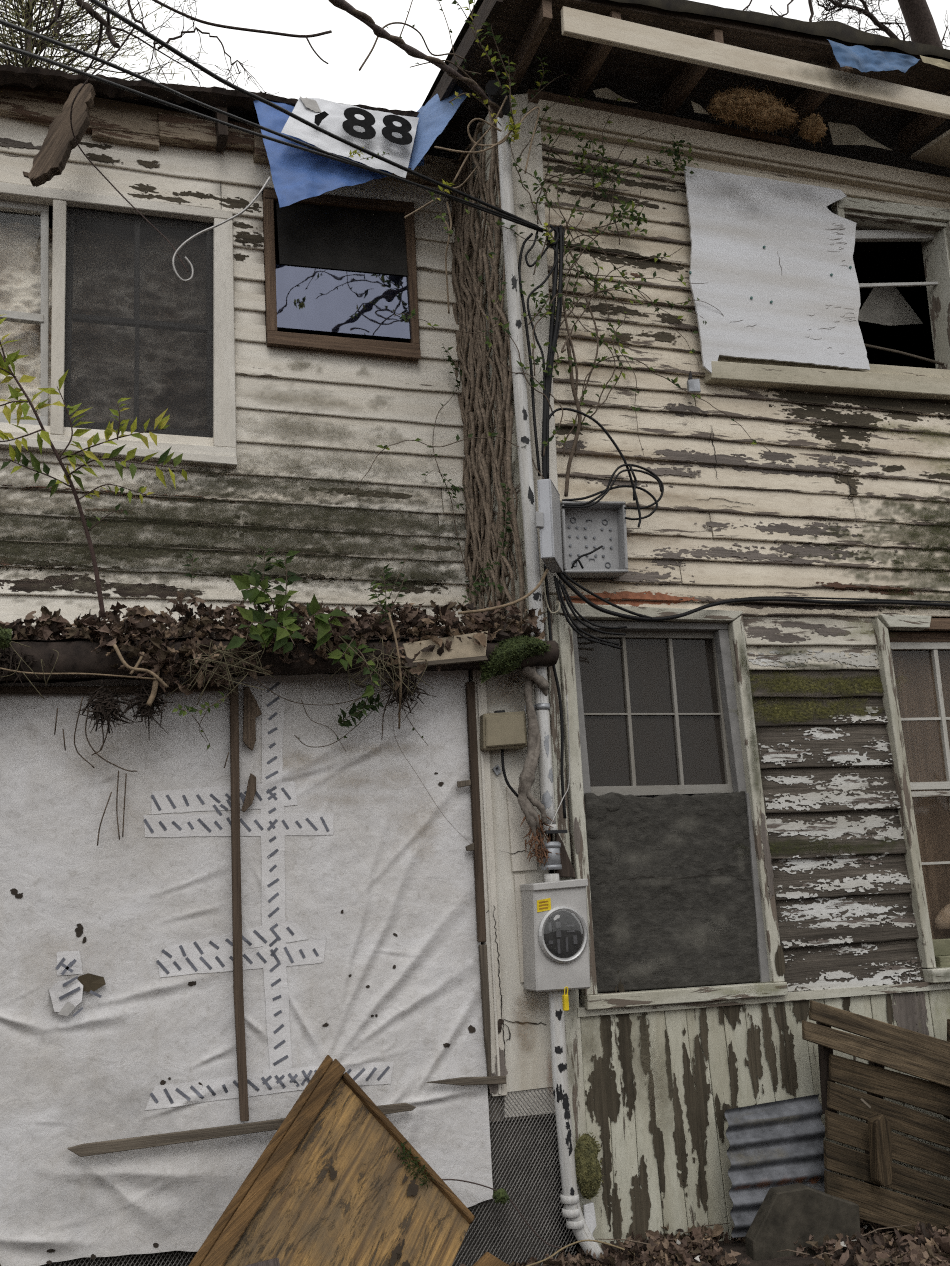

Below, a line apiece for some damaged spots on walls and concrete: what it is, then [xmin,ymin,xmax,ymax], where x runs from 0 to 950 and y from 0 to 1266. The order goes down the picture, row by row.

peeling [0,137,42,149]
peeling [80,142,161,168]
peeling [122,183,264,263]
peeling [543,165,686,208]
peeling [546,241,684,277]
peeling [566,301,686,344]
peeling [583,389,950,503]
leakage [0,464,466,586]
leakage [741,649,882,723]
peeling [585,707,932,1247]